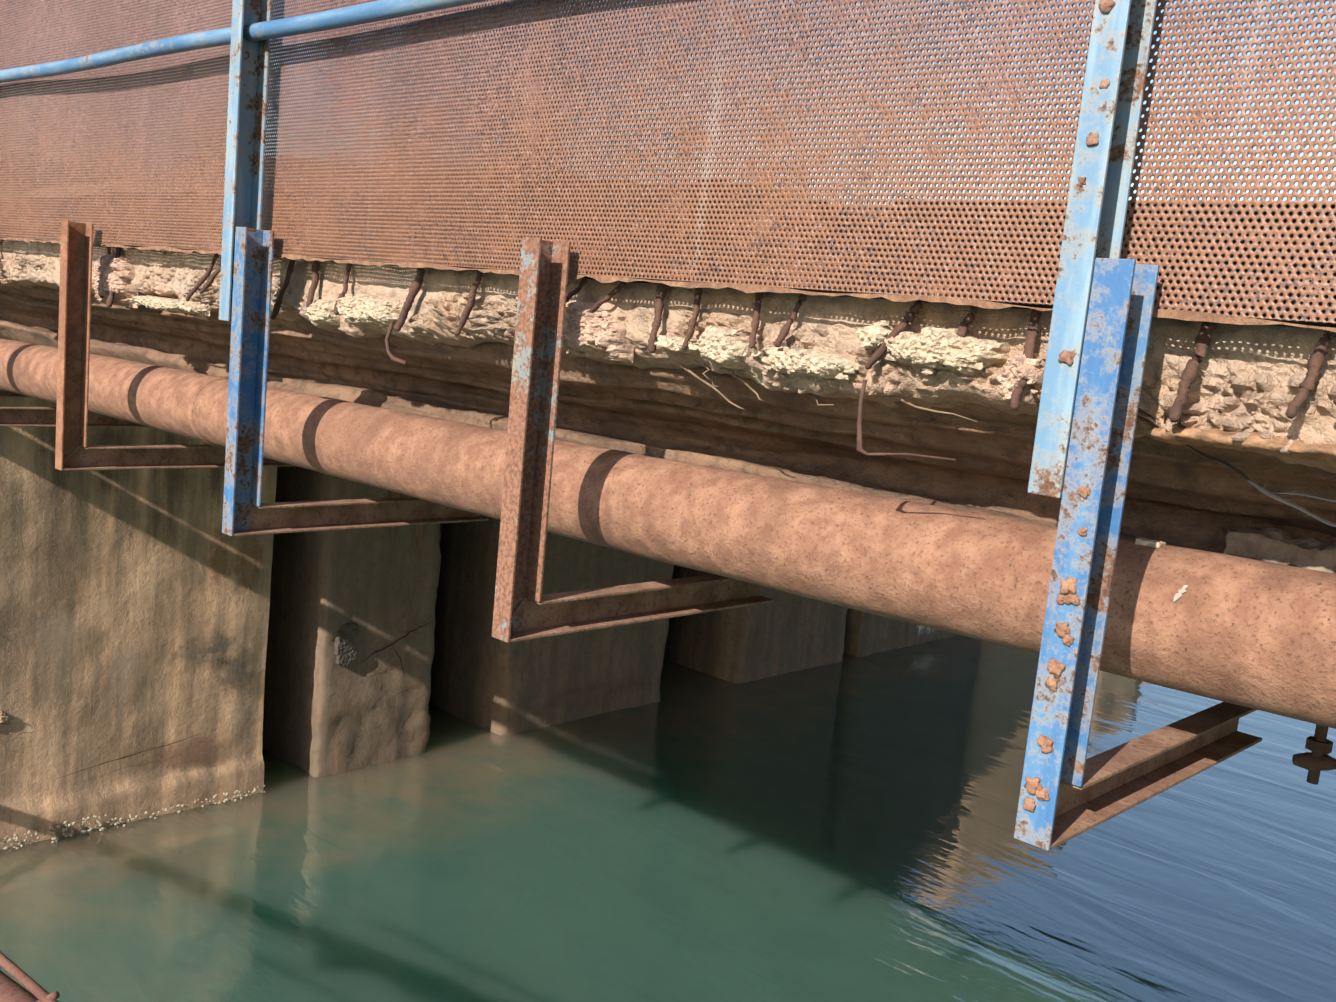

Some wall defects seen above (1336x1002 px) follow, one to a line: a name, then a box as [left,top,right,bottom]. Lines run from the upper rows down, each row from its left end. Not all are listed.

spalling [92,247,221,316]
spalling [270,259,295,320]
spalling [303,261,425,332]
spalling [455,272,483,336]
spalling [563,278,1045,410]
spalling [1168,322,1217,423]
spalling [1285,330,1336,419]
crack [349,621,434,676]